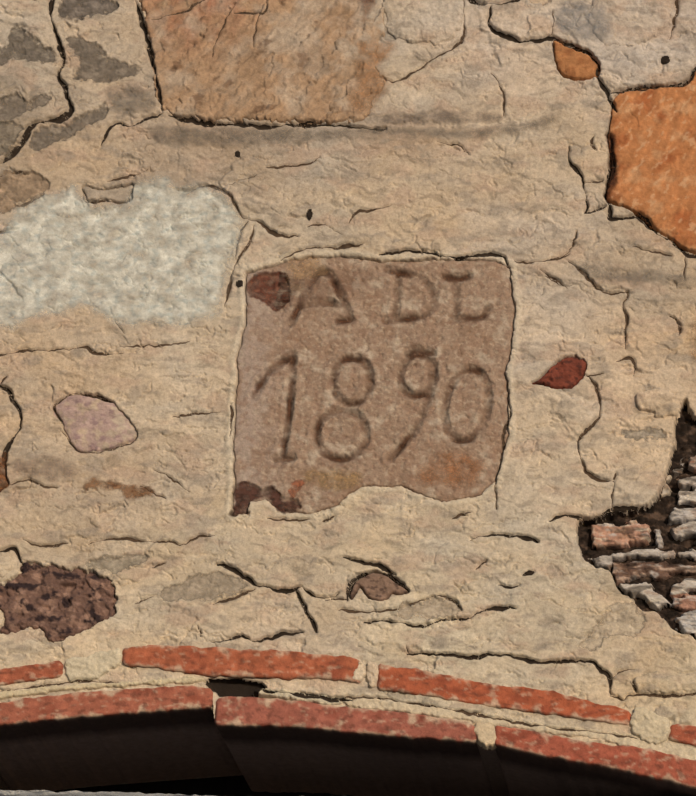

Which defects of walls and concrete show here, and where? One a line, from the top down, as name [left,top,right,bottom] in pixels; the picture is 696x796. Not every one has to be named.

crack [0,0,74,177]
crack [101,0,386,146]
crack [379,0,696,116]
crack [174,157,391,306]
crack [568,136,696,278]
crack [0,376,58,491]
crack [0,319,190,356]
crack [53,393,138,453]
crack [379,232,647,528]
crack [470,534,538,543]
spalling [578,404,696,651]
crack [197,557,696,701]